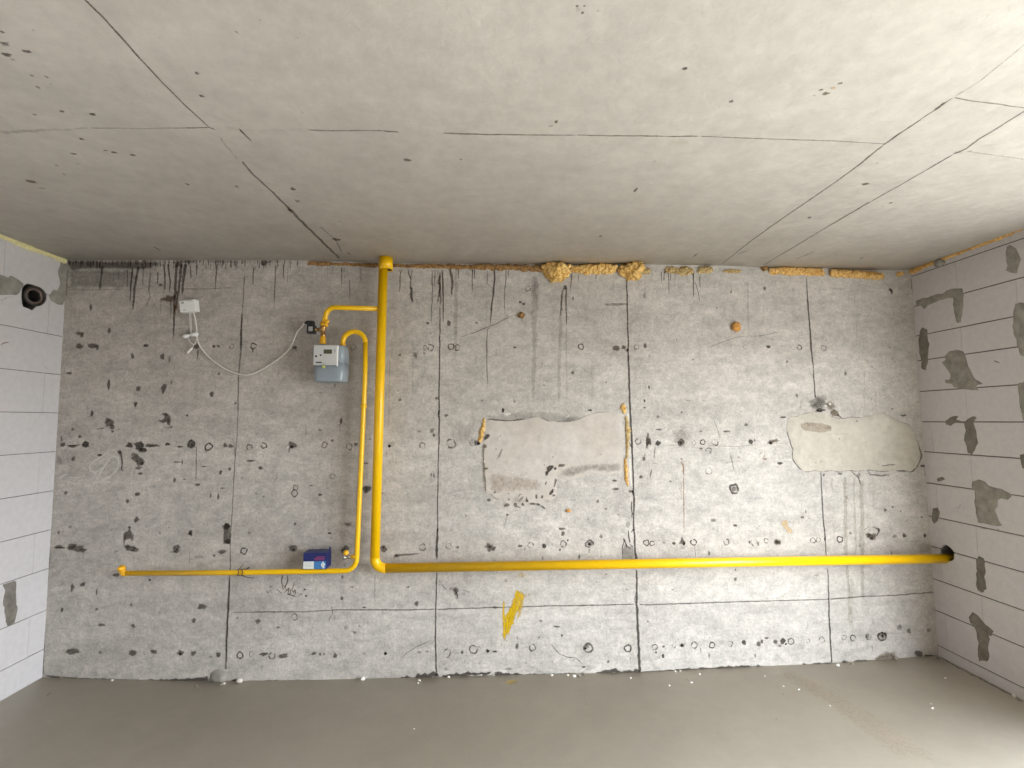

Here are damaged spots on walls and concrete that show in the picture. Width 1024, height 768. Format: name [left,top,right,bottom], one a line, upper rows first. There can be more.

damp [69,260,298,336]
damp [431,269,459,318]